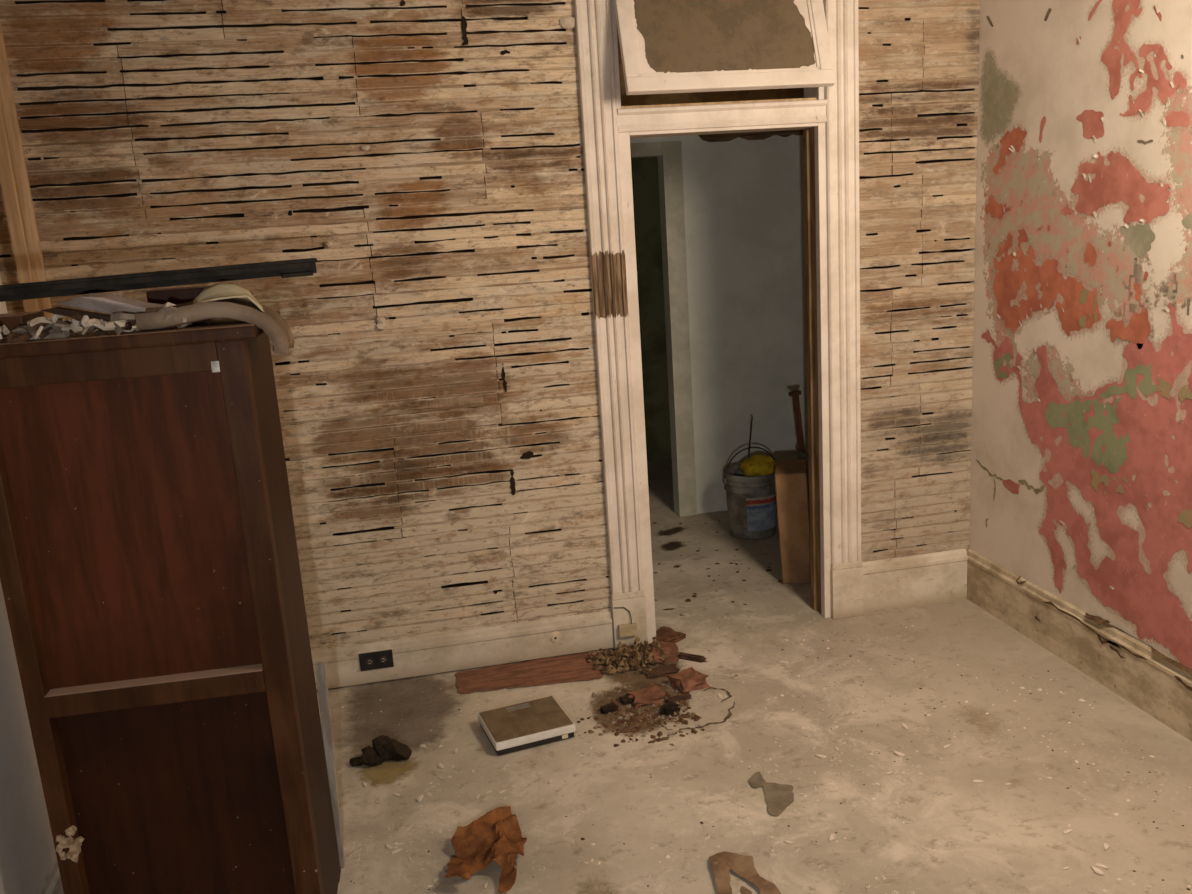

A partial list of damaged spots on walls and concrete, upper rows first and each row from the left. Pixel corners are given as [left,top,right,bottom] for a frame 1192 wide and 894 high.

water stain [4,5,113,71]
water stain [351,27,447,110]
flaking render [616,20,804,106]
water stain [19,93,146,152]
water stain [26,164,137,211]
water stain [384,181,443,228]
water stain [494,150,574,170]
peeling [980,0,1192,691]
water stain [314,360,562,519]